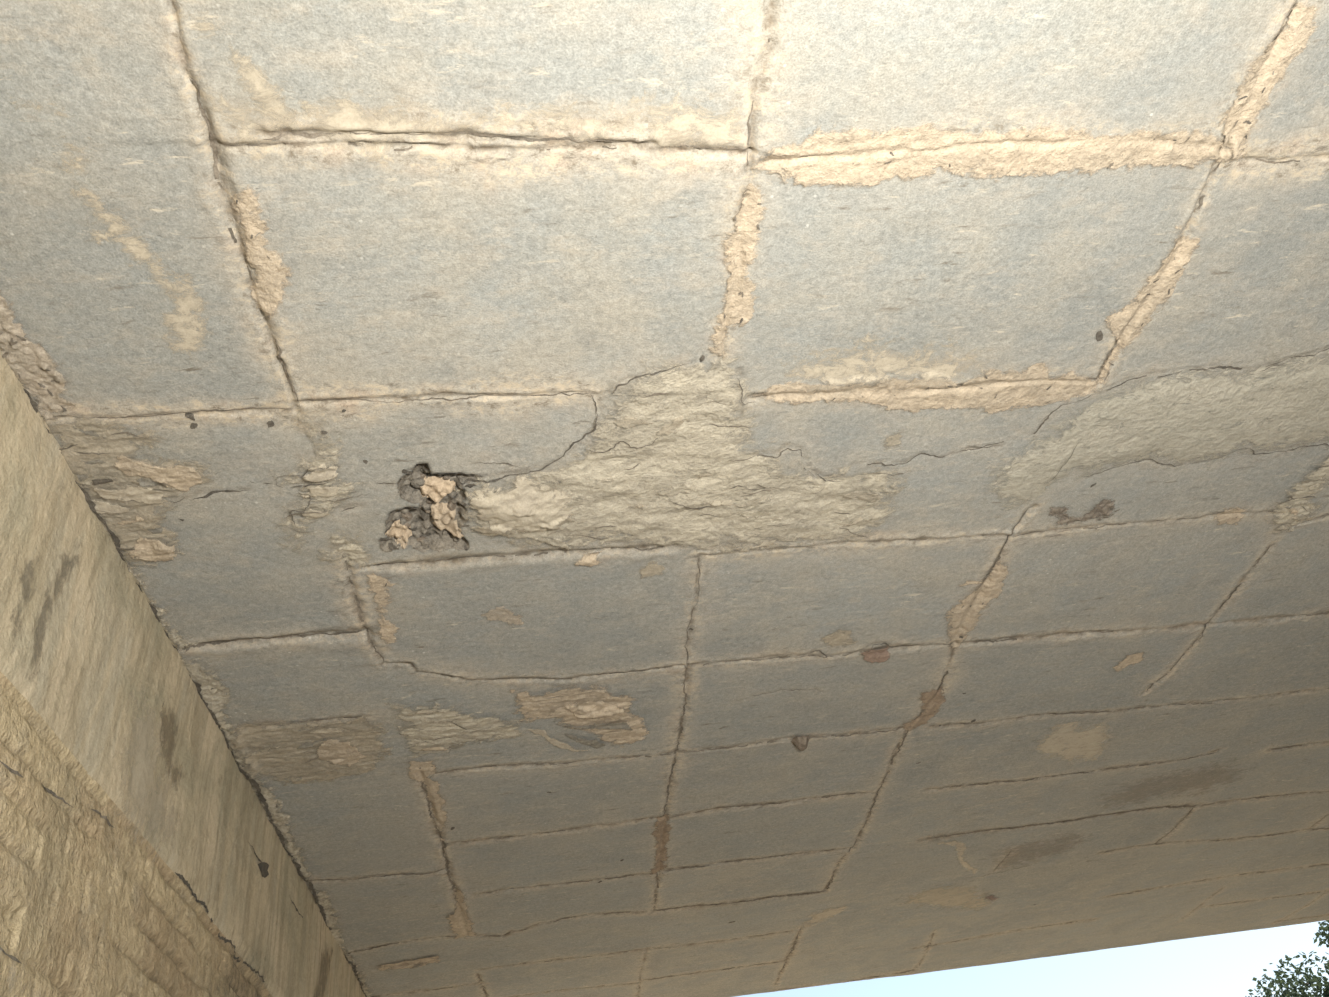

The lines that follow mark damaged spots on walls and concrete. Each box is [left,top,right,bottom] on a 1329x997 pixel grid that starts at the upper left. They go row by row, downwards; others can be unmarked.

spalling [399,507,436,536]
crack [443,362,692,485]
crack [685,448,840,510]
crack [868,348,1329,466]
crack [1027,440,1329,483]
peeling [0,290,393,997]
crack [23,388,396,997]
peeling [510,685,649,752]